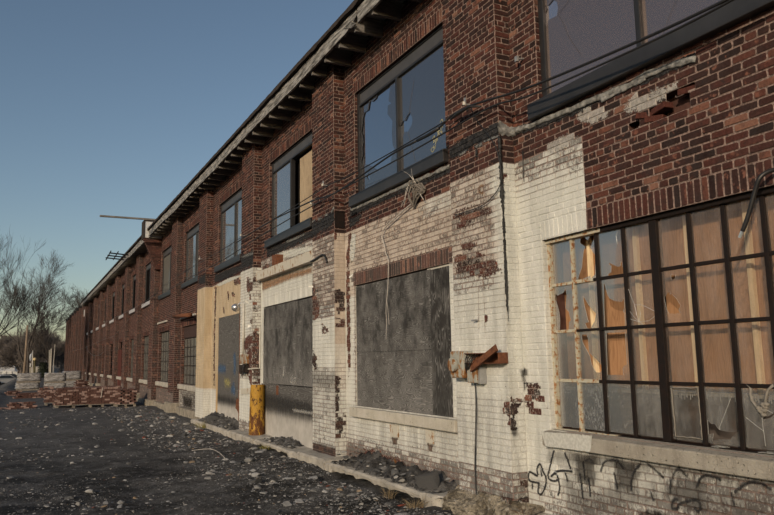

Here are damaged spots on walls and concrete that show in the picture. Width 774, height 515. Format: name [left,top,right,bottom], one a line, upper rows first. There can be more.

peeling [453,204,491,230]
peeling [452,242,502,280]
peeling [213,275,260,386]
peeling [308,233,356,438]
peeling [499,382,548,435]